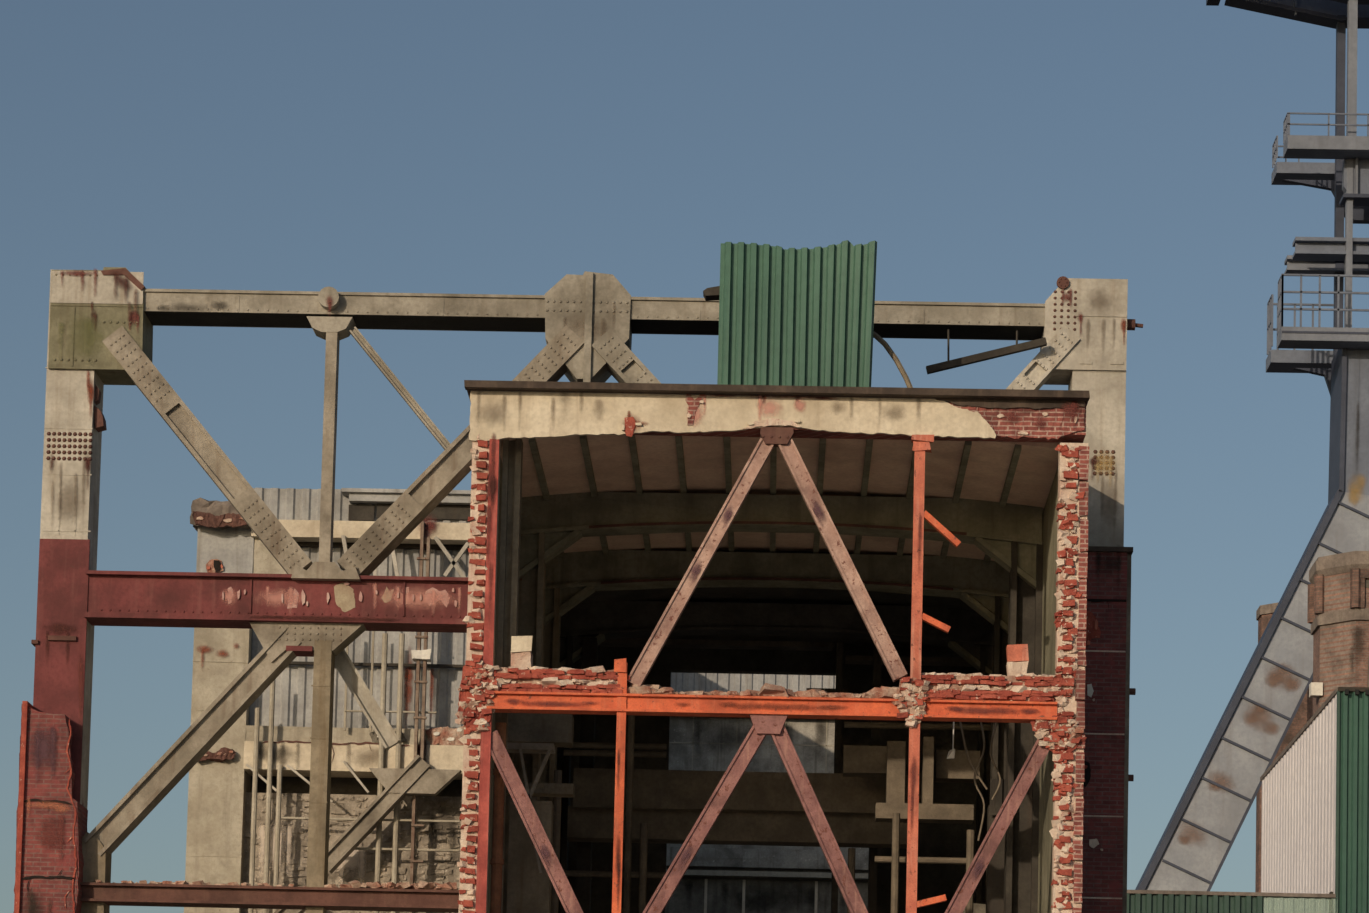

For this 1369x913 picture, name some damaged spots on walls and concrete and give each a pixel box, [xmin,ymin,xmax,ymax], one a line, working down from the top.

corrosion [61,269,97,284]
corrosion [114,274,139,327]
spalling [949,403,1085,440]
peeling [281,589,308,609]
peeling [327,582,457,612]
spalling [1030,715,1091,787]